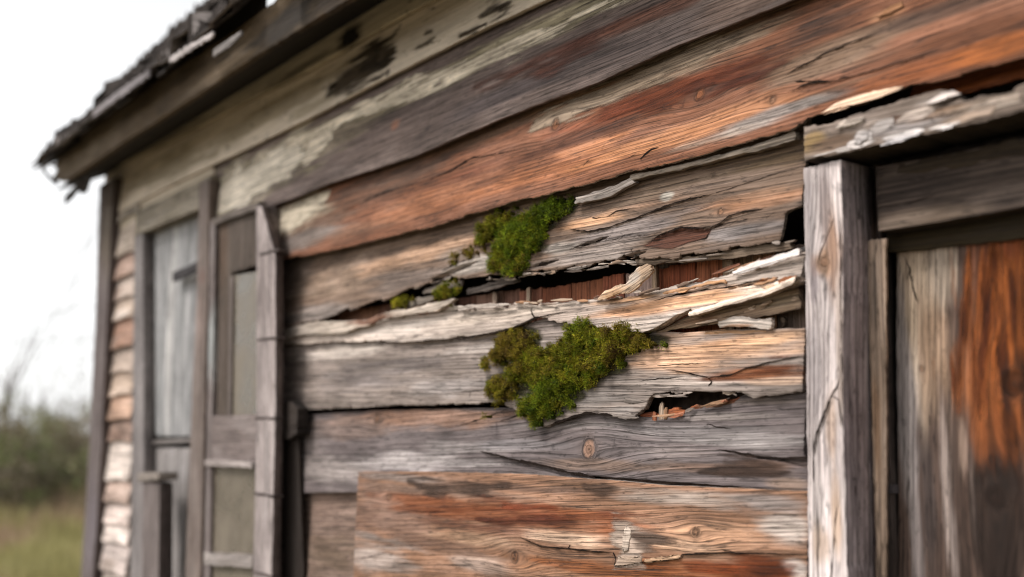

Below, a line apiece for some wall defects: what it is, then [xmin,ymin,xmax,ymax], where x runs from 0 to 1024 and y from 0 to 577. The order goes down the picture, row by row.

peeling [754,276,796,289]
crack [812,219,842,482]
crack [481,451,595,478]
spalling [610,521,682,567]